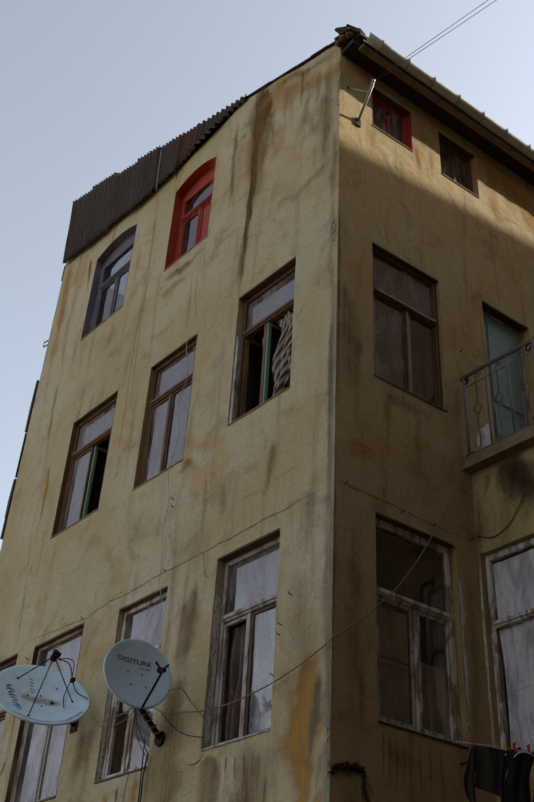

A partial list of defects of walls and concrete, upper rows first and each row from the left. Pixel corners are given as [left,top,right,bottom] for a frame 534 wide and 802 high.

damp [240,91,272,260]
rust [283,657,321,802]